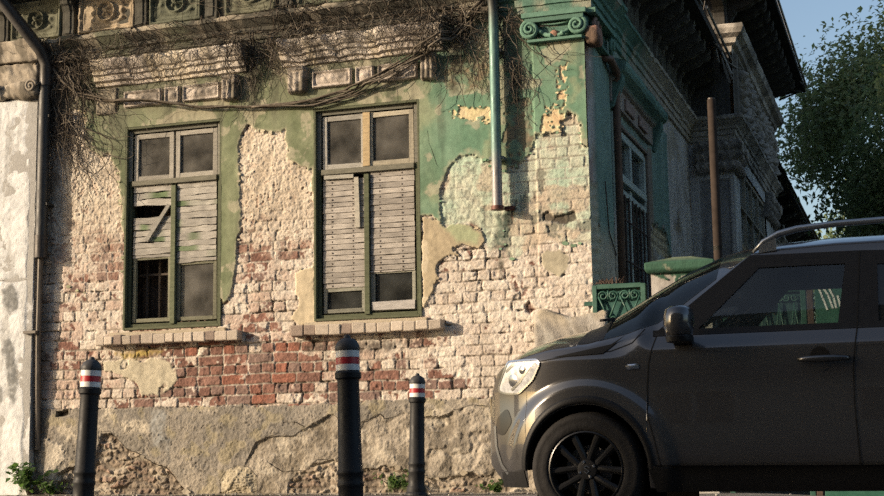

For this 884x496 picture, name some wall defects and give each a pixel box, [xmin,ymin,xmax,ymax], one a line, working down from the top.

peeling [42,106,124,301]
peeling [224,128,314,311]
peeling [437,54,603,286]
peeling [651,274,674,295]
flaking render [140,325,339,407]
flaking render [422,357,473,398]
peeling [34,437,75,496]
spalling [94,433,190,496]
crack [242,414,338,488]
spalling [244,414,338,495]
spalling [361,410,410,494]
spalling [424,406,537,494]